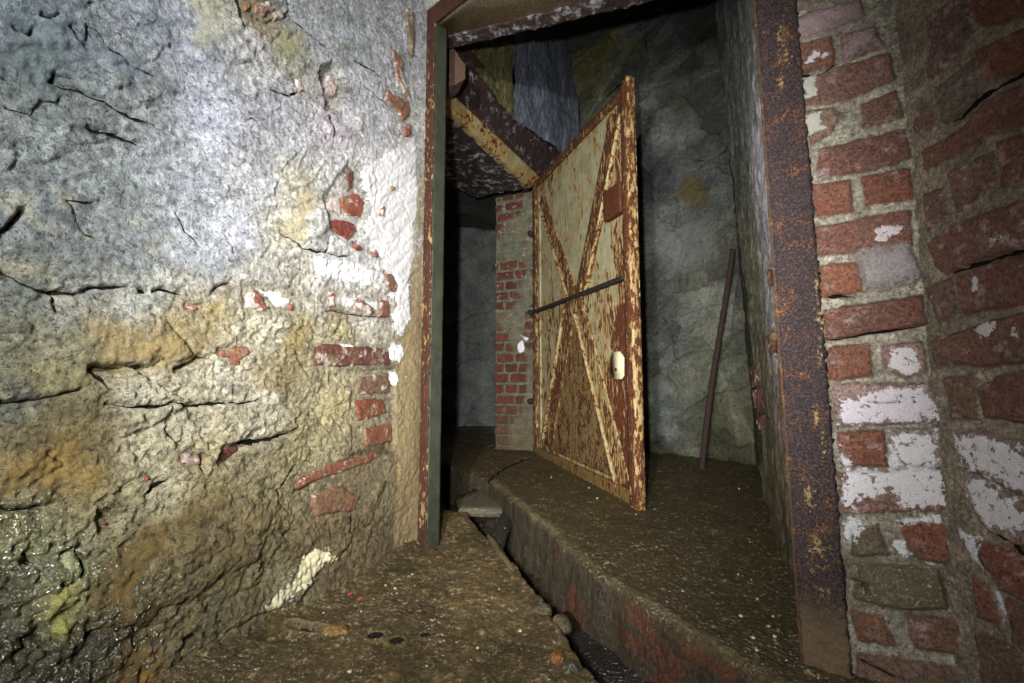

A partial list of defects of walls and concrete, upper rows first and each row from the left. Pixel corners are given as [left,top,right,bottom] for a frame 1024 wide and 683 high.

crack [5,73,155,146]
crack [953,72,1024,122]
crack [0,212,21,234]
crack [66,200,94,238]
crack [3,274,180,312]
flaking render [234,278,302,322]
peeling [286,4,421,548]
crack [172,356,204,370]
flaking render [210,338,257,373]
crack [0,364,256,445]
crack [234,427,297,446]
water stain [49,555,81,637]